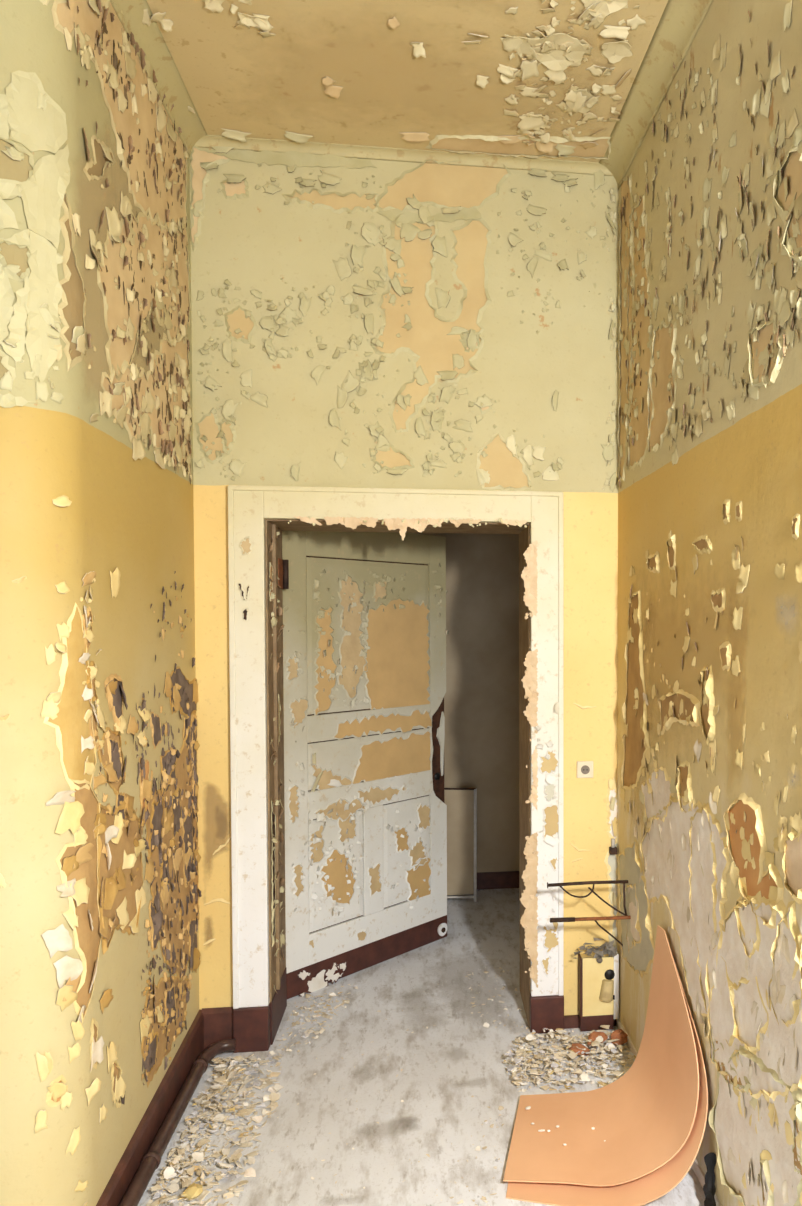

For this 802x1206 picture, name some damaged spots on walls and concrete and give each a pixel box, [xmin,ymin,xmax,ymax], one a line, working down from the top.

peeling [0,0,802,492]
peeling [52,495,72,507]
peeling [521,541,538,619]
peeling [722,499,742,525]
peeling [791,513,800,540]
peeling [34,567,202,1133]
peeling [269,516,528,997]
peeling [520,639,562,991]
spalling [604,530,802,1206]